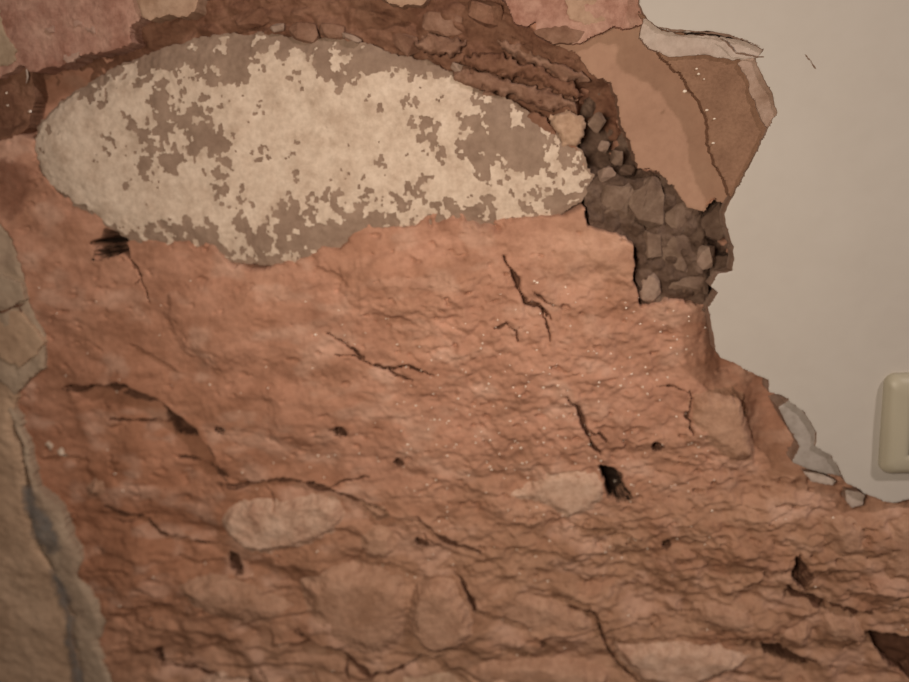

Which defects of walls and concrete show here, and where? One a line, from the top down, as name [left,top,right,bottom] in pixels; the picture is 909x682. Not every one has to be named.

crack [127,257,150,302]
flaking render [0,0,909,508]
crack [494,322,519,342]
crack [503,255,556,341]
flaking render [0,224,112,682]
crack [61,383,384,510]
crack [416,517,481,553]